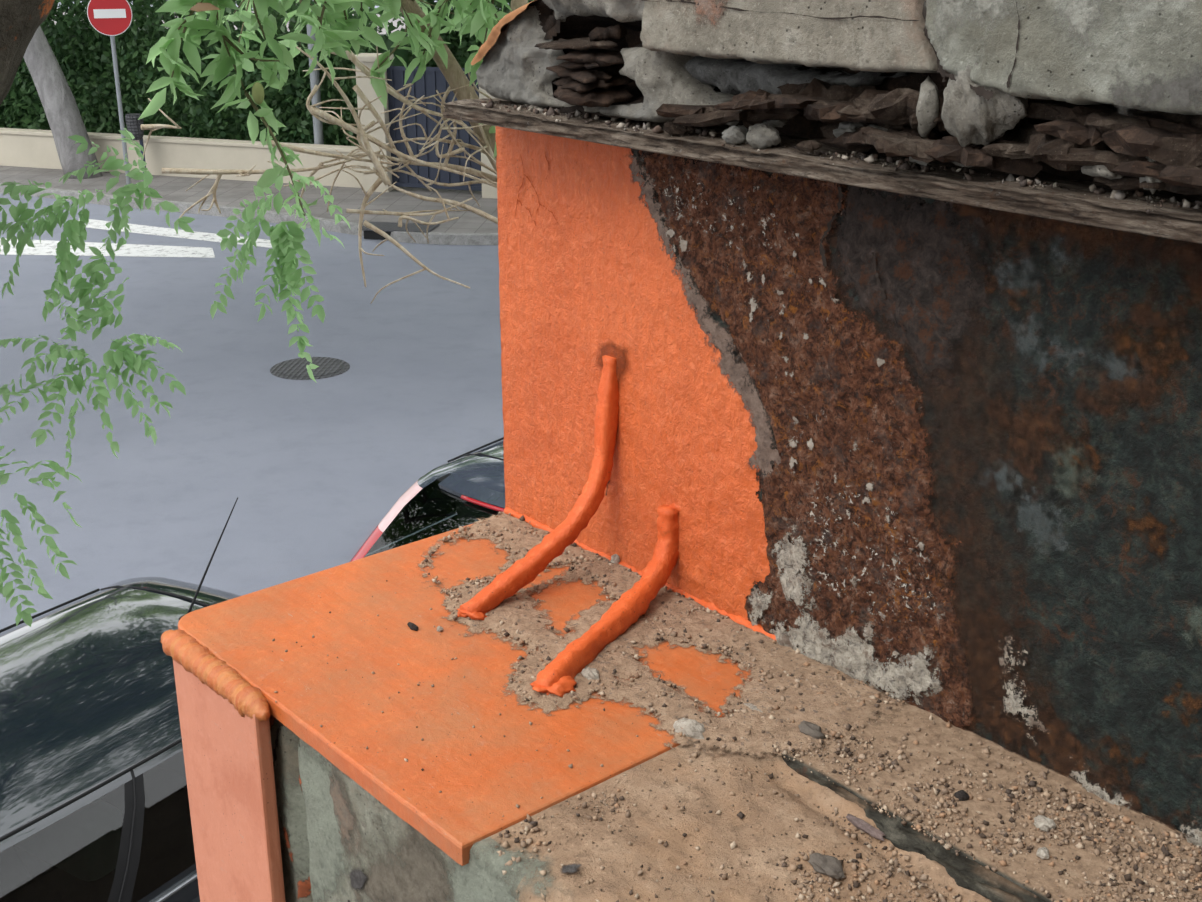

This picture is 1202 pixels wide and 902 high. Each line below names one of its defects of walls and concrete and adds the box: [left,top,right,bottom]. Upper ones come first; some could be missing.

spalling [529,0,644,118]
crack [641,0,1020,101]
peeling [654,176,785,315]
peeling [788,438,814,474]
corrosion [637,150,1202,832]
leakage [748,525,943,705]